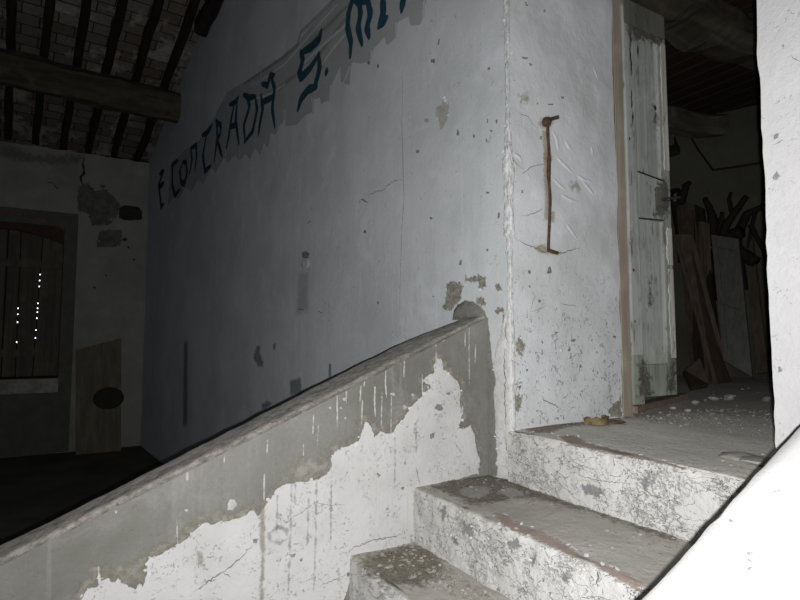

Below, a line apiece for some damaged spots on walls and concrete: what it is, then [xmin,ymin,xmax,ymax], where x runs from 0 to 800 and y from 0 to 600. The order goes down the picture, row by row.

peeling [424,96,450,130]
flaking render [77,184,129,249]
flaking render [442,274,502,310]
peeling [70,354,485,600]